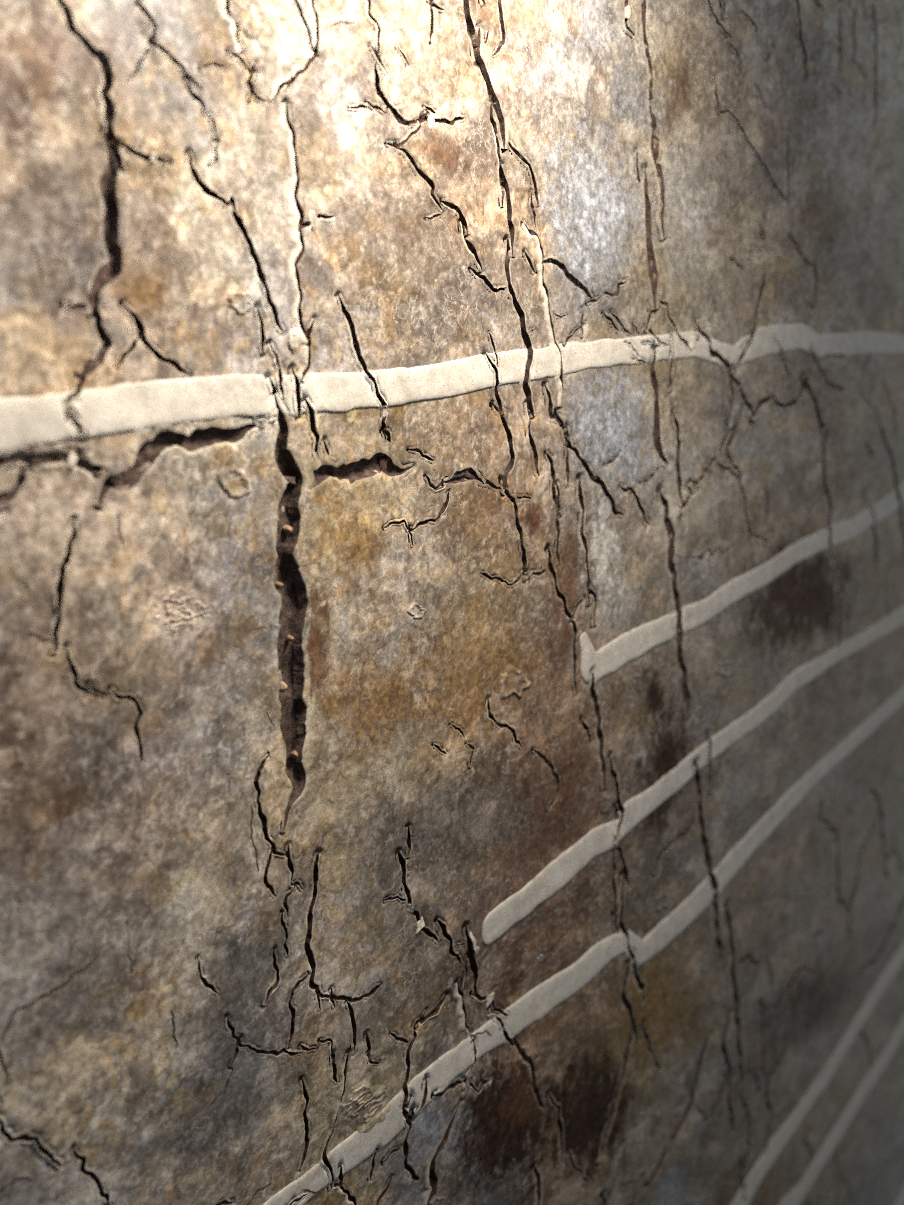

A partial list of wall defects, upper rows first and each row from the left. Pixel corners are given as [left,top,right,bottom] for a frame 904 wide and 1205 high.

crack [793,0,879,126]
crack [861,379,904,546]
crack [0,0,434,1205]
crack [348,0,847,1205]
leakage [739,551,850,654]
crack [869,504,890,615]
crack [814,788,904,974]
leakage [414,1052,634,1205]